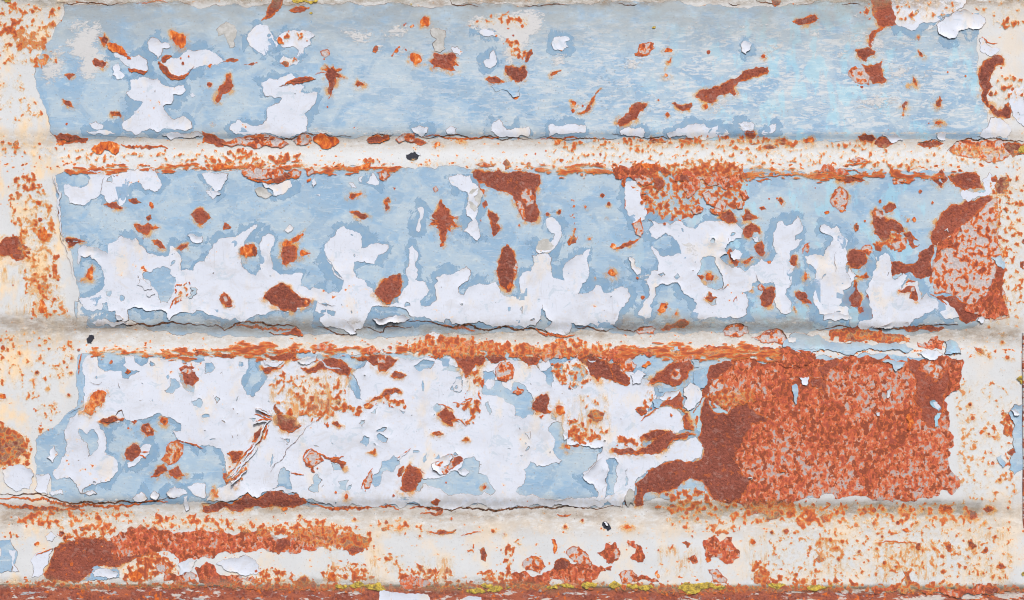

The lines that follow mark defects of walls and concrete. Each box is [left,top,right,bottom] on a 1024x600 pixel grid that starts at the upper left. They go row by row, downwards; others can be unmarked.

peeling [54,19,351,154]
peeling [546,30,576,76]
peeling [933,9,1000,57]
corrosion [965,54,1024,126]
corrosion [0,172,95,320]
peeling [64,167,171,211]
corrosion [0,138,401,187]
corrosion [263,282,314,315]
peeling [77,172,961,372]
corrosion [466,99,1024,329]
peeling [0,354,704,520]
corrosion [0,325,1024,598]